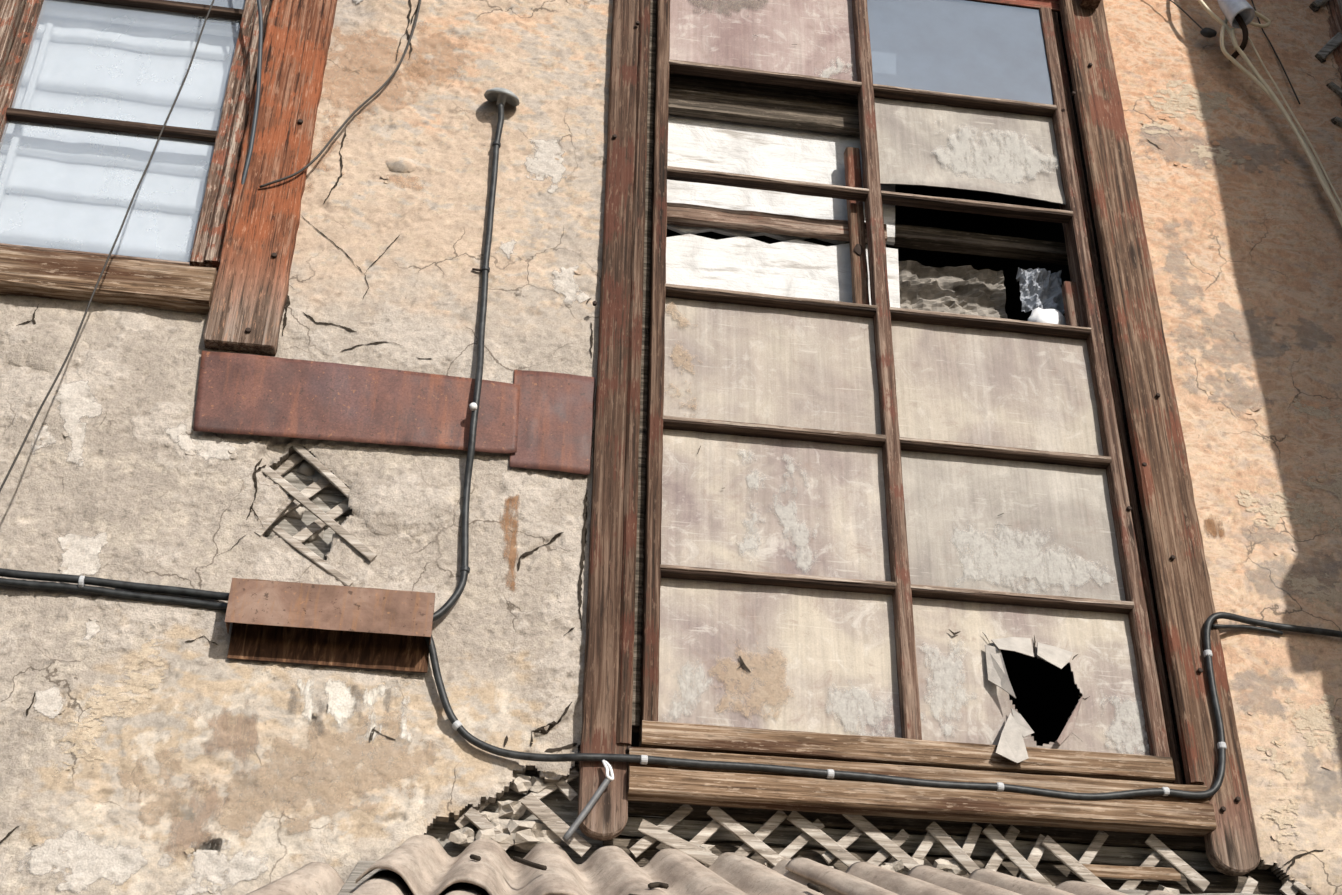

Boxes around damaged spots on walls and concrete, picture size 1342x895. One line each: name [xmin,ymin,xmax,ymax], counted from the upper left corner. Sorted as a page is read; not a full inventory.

crack [301,129,399,298]
crack [282,286,431,359]
corrosion [502,495,519,589]
flaking render [427,750,603,870]